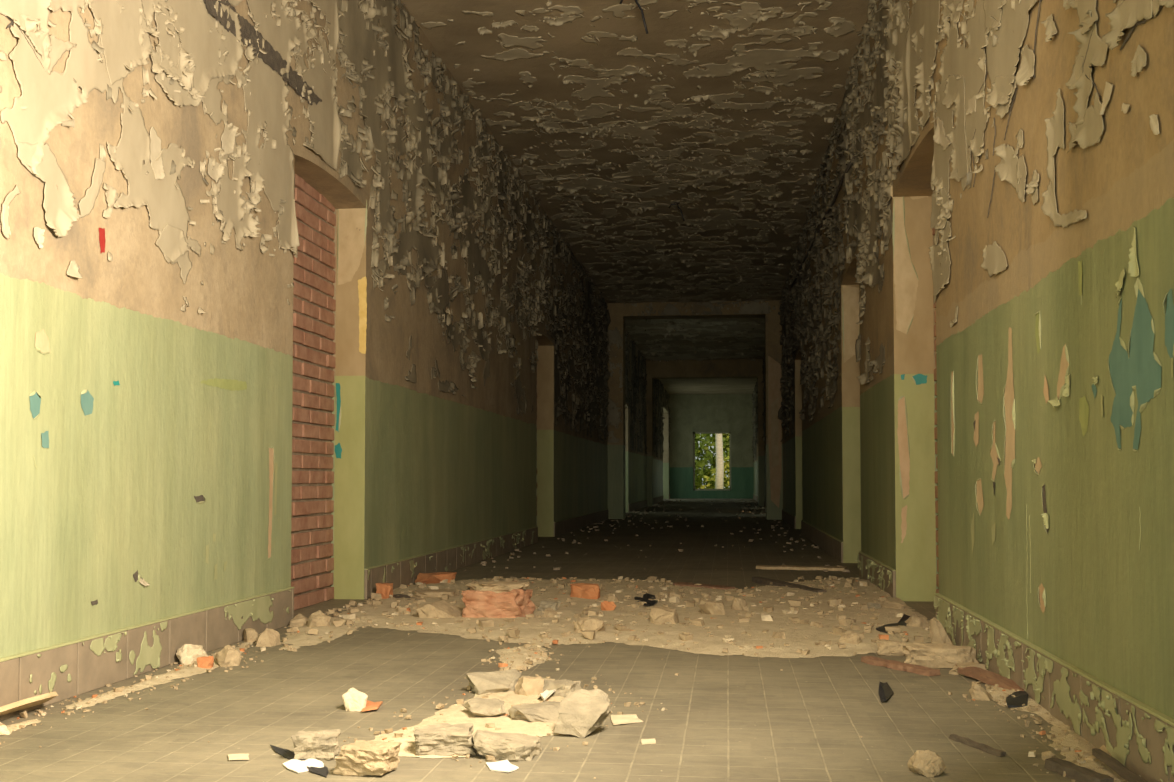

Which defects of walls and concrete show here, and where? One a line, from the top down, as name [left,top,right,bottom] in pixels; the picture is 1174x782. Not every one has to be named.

peeling [0,0,1174,508]
peeling [268,447,278,559]
peeling [897,396,910,543]
peeling [971,327,1016,552]
peeling [1031,457,1049,534]
peeling [29,664,72,694]
peeling [83,621,168,675]
peeling [224,596,289,629]
peeling [1038,583,1046,613]
peeling [934,595,1174,782]